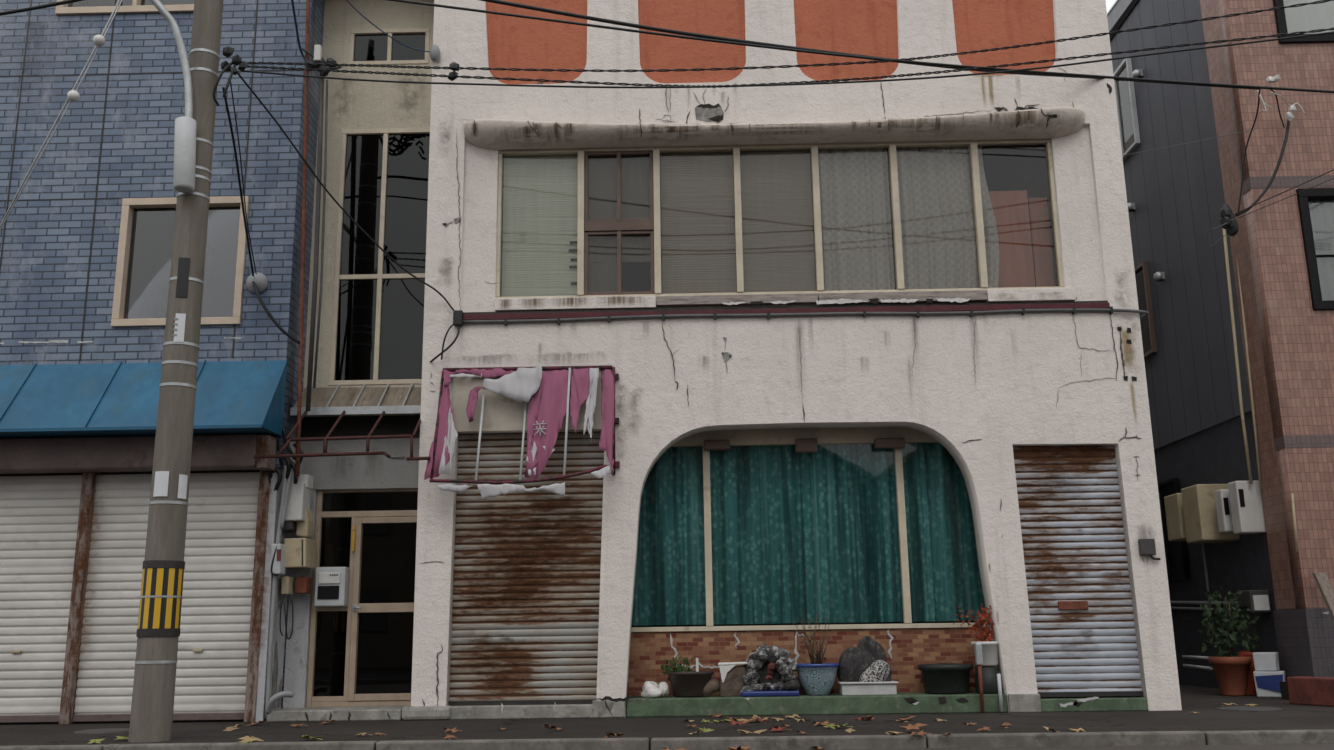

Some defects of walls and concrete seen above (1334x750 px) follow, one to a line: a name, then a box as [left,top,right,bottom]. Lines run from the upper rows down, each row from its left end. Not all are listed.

crack [662,321,689,405]
crack [1056,297,1118,407]